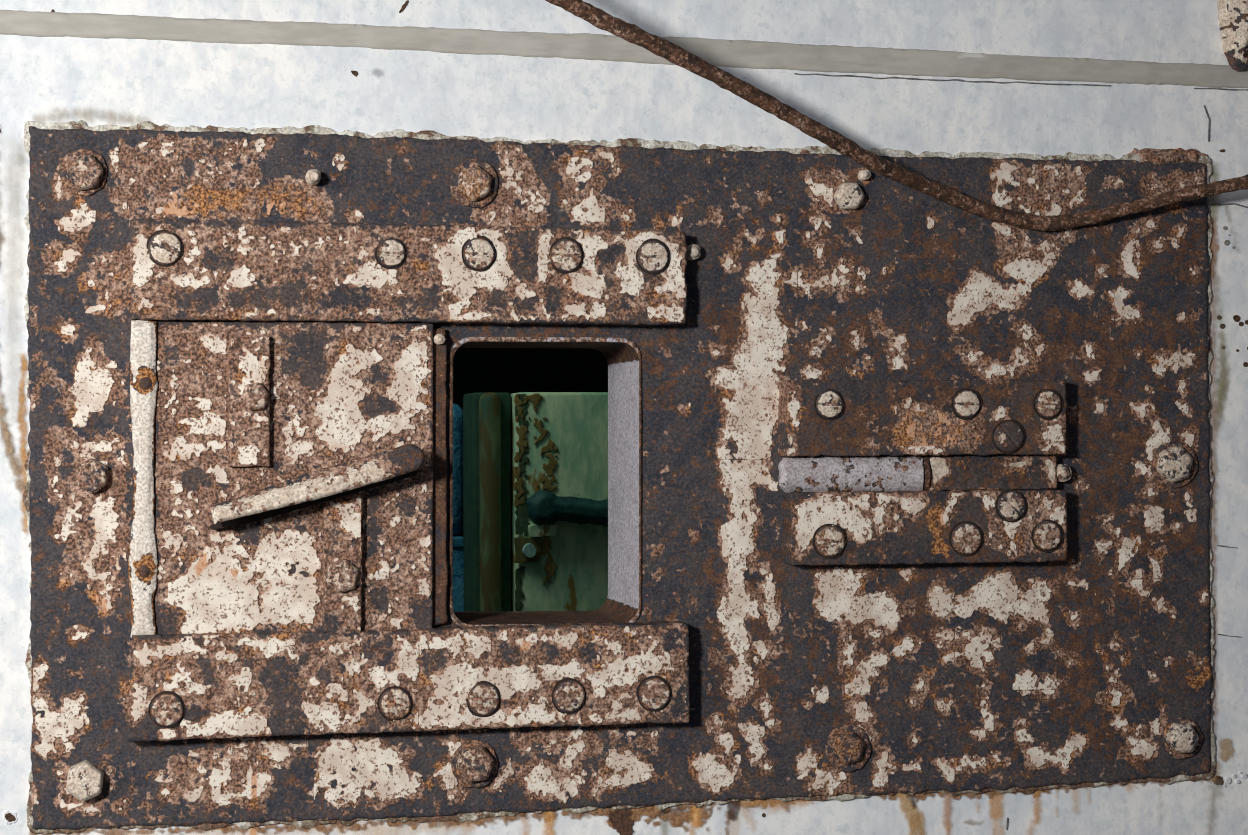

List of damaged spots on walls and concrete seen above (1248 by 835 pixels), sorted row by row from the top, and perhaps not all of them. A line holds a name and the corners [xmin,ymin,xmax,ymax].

peeling [48,451,127,614]
peeling [66,346,127,466]
peeling [109,138,686,809]
rust [514,393,558,508]
peeling [692,177,867,795]
peeling [795,493,927,552]
peeling [1095,350,1197,619]
peeling [813,566,1071,742]
peeling [33,664,99,814]
rust [30,799,806,835]
rust [878,790,1018,835]
rust [1033,786,1069,822]